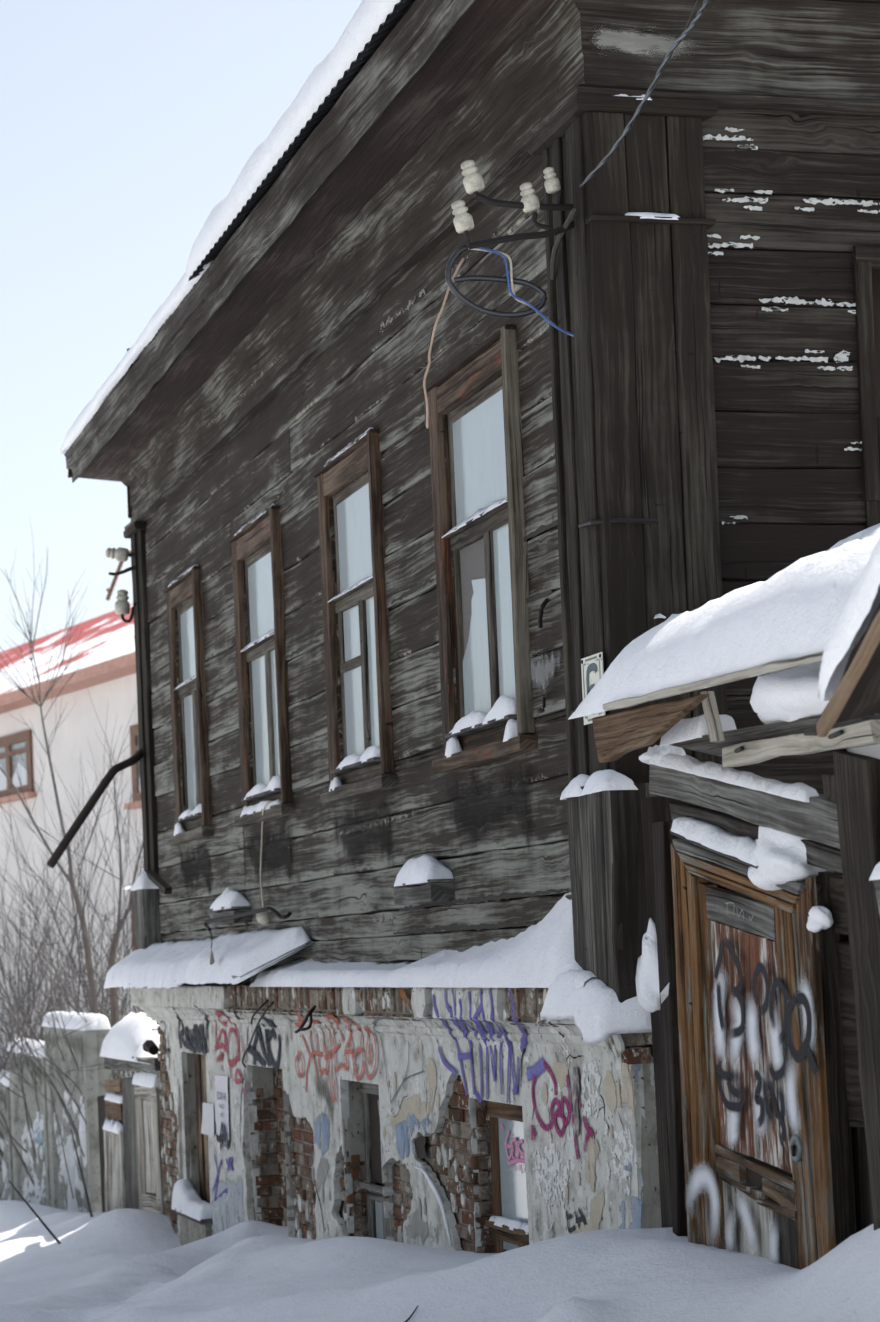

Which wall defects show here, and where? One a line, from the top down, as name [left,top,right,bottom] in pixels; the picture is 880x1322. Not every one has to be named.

peeling [703,127,758,150]
peeling [715,188,773,211]
peeling [795,198,880,214]
peeling [707,234,760,256]
peeling [759,296,856,314]
peeling [714,349,853,371]
spalling [226,984,435,1021]
flaking render [157,1022,186,1244]
flaking render [250,1088,269,1223]
flaking render [289,1099,363,1240]
flaking render [383,1039,492,1253]
peeling [533,1033,658,1234]